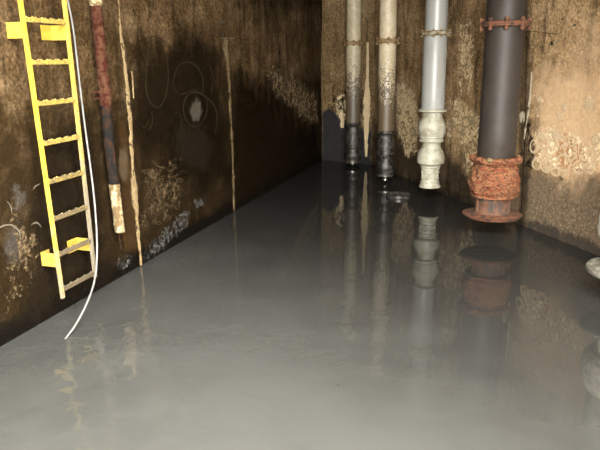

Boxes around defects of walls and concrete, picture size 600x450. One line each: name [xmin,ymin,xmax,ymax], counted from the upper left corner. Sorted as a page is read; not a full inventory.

damp [117,0,318,269]
damp [519,25,600,256]